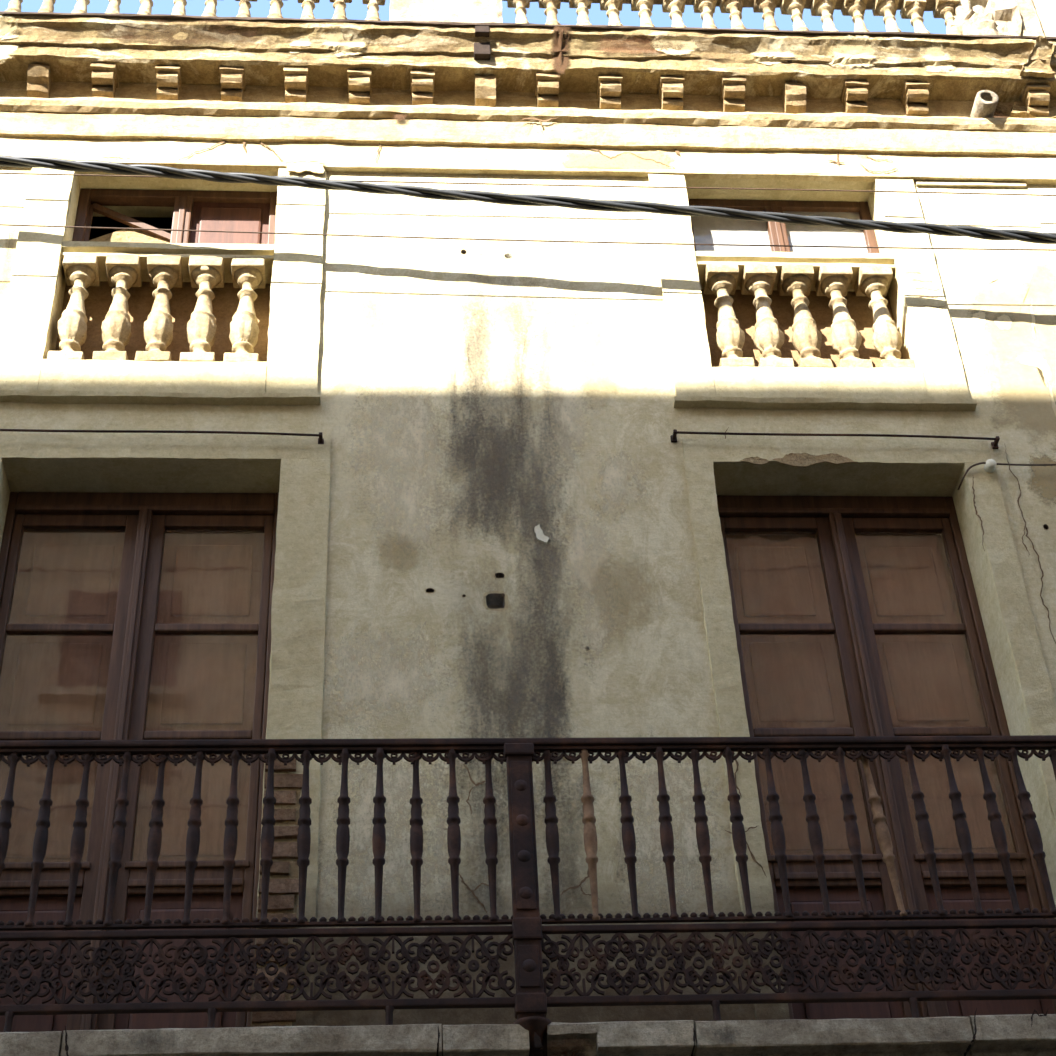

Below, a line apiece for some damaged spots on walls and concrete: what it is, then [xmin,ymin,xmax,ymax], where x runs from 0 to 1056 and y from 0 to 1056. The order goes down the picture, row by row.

peeling [0,16,18,59]
peeling [653,34,699,57]
peeling [829,35,877,68]
peeling [919,42,954,72]
crack [176,140,283,161]
damp [352,193,429,253]
damp [449,185,578,261]
crack [972,477,985,551]
crack [1005,446,1056,643]
damp [334,762,447,905]
damp [625,761,721,892]
crack [964,1008,977,1056]